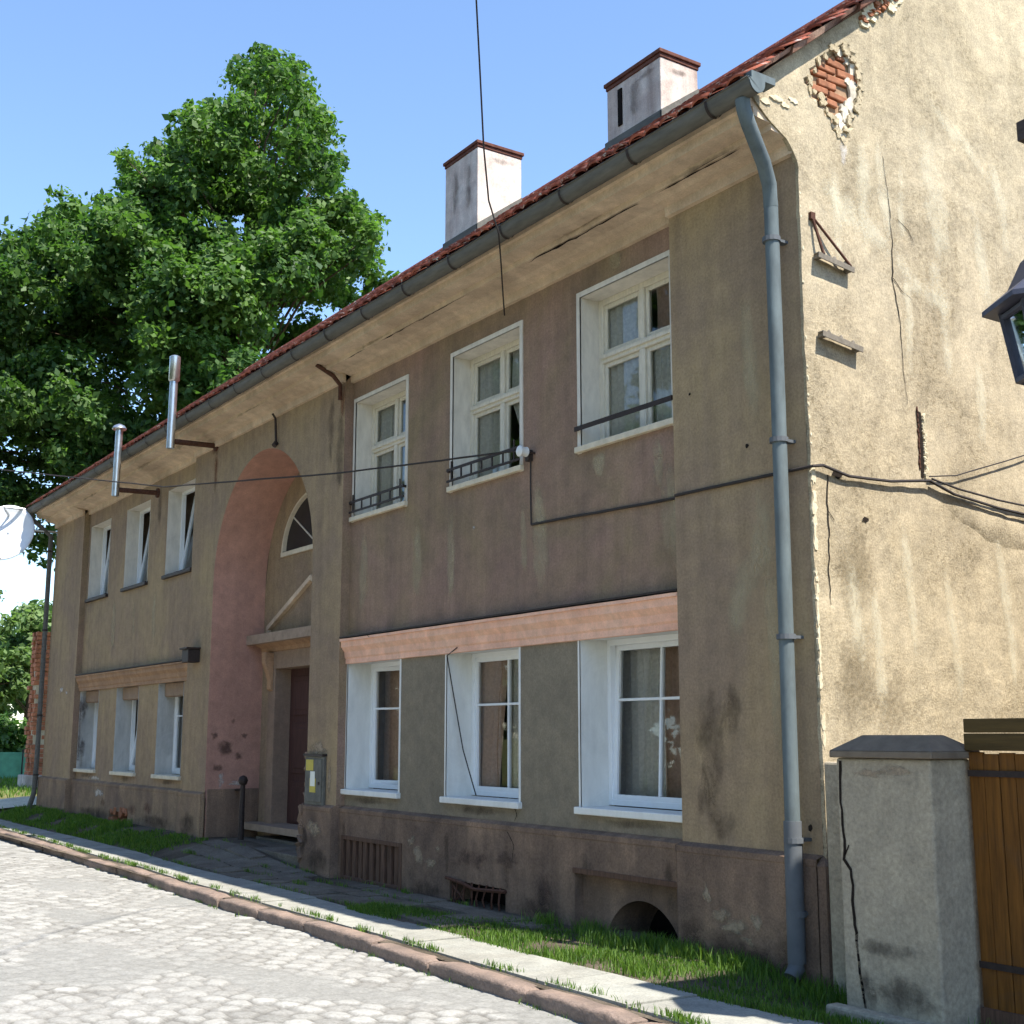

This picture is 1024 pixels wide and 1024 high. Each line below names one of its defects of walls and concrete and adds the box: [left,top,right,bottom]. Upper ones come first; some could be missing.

spalling [858,0,904,29]
flaking render [806,42,863,161]
crack [658,149,739,193]
crack [531,205,635,262]
crack [883,159,913,404]
flaking render [916,406,929,479]
spalling [809,467,819,550]
spalling [813,567,823,689]
crack [839,761,867,1007]